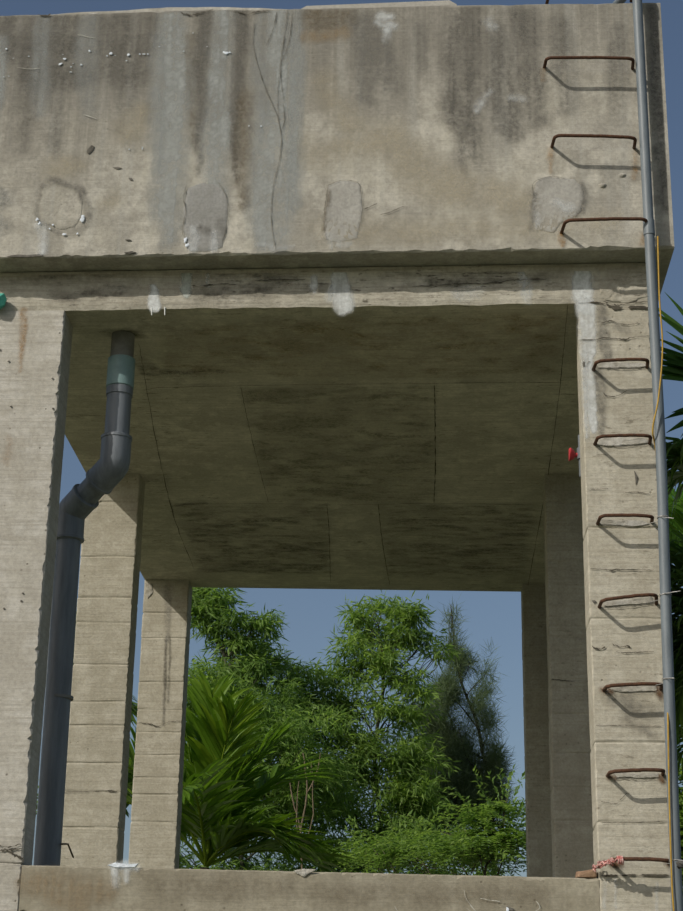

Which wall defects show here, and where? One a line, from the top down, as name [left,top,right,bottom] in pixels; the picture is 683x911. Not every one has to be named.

leakage [0,10,393,250]
crack [180,9,293,249]
leakage [331,272,352,314]
crack [0,844,24,864]